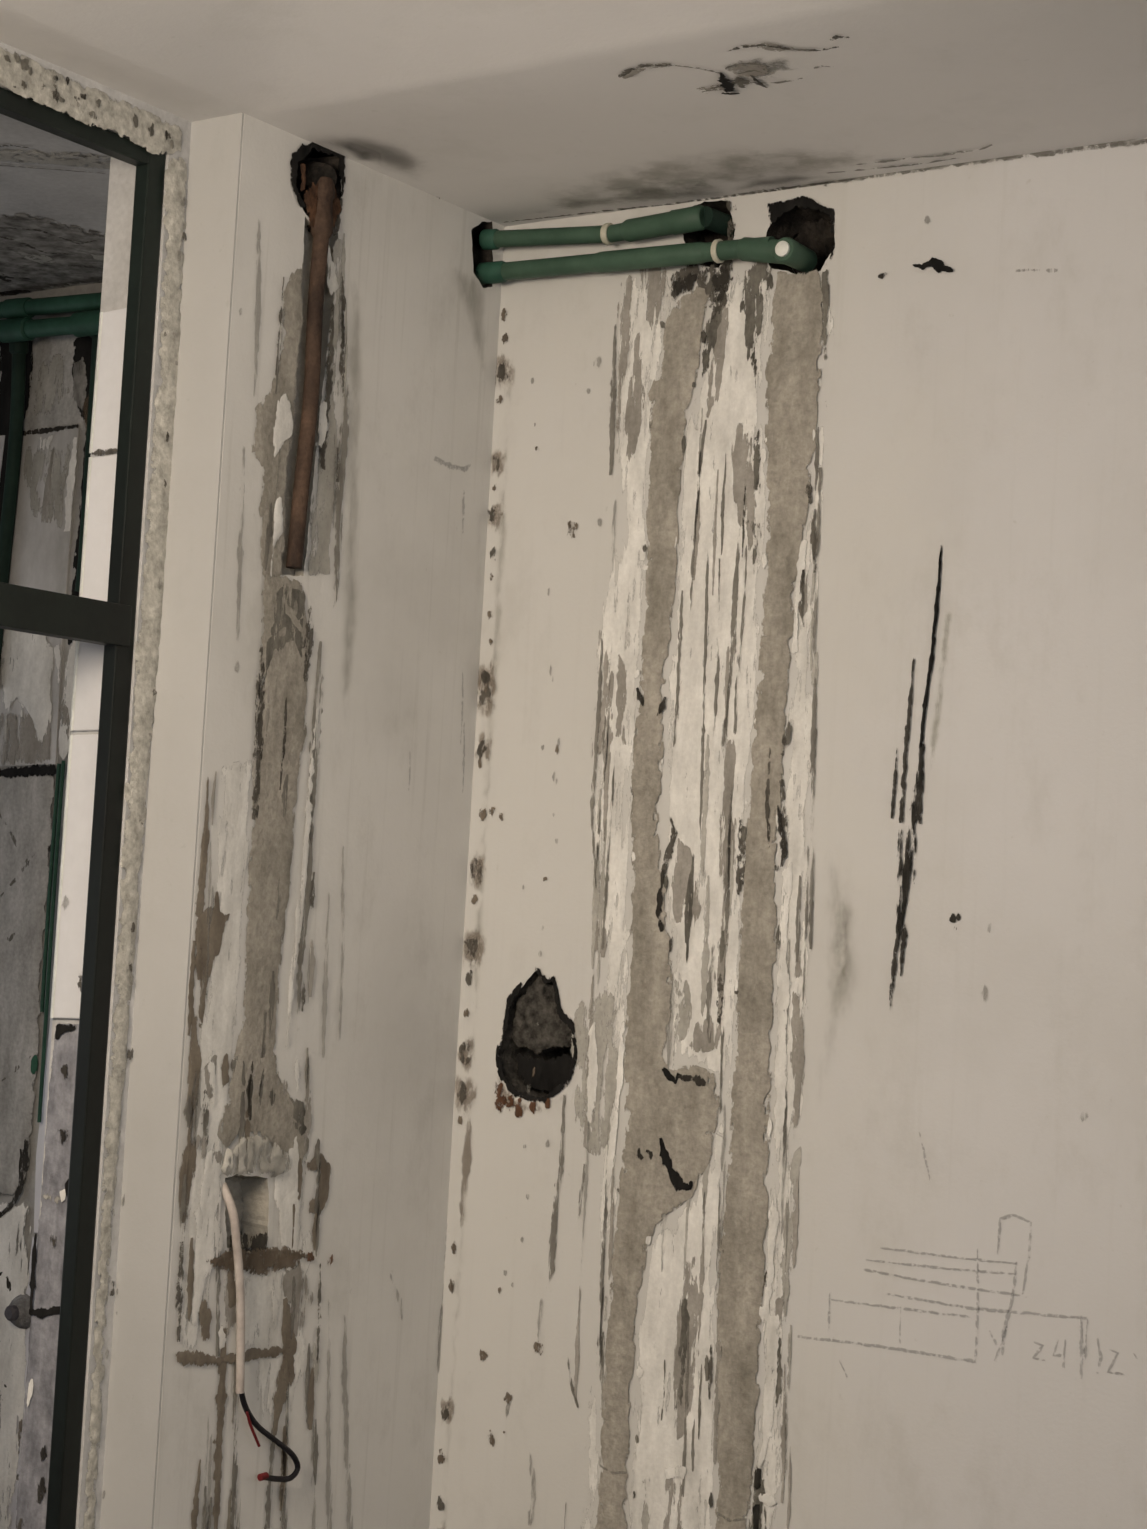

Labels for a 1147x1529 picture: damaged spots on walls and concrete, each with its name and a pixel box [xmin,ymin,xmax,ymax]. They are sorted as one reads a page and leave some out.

corrosion [300,164,342,228]
water stain [504,179,855,223]
spalling [694,200,732,216]
spalling [479,671,491,706]
spalling [477,740,486,769]
spalling [479,807,503,821]
spalling [470,858,482,904]
peeling [494,267,673,1529]
peeling [629,205,835,1529]
peeling [179,497,319,1350]
spalling [464,938,478,986]
spalling [457,1082,466,1125]